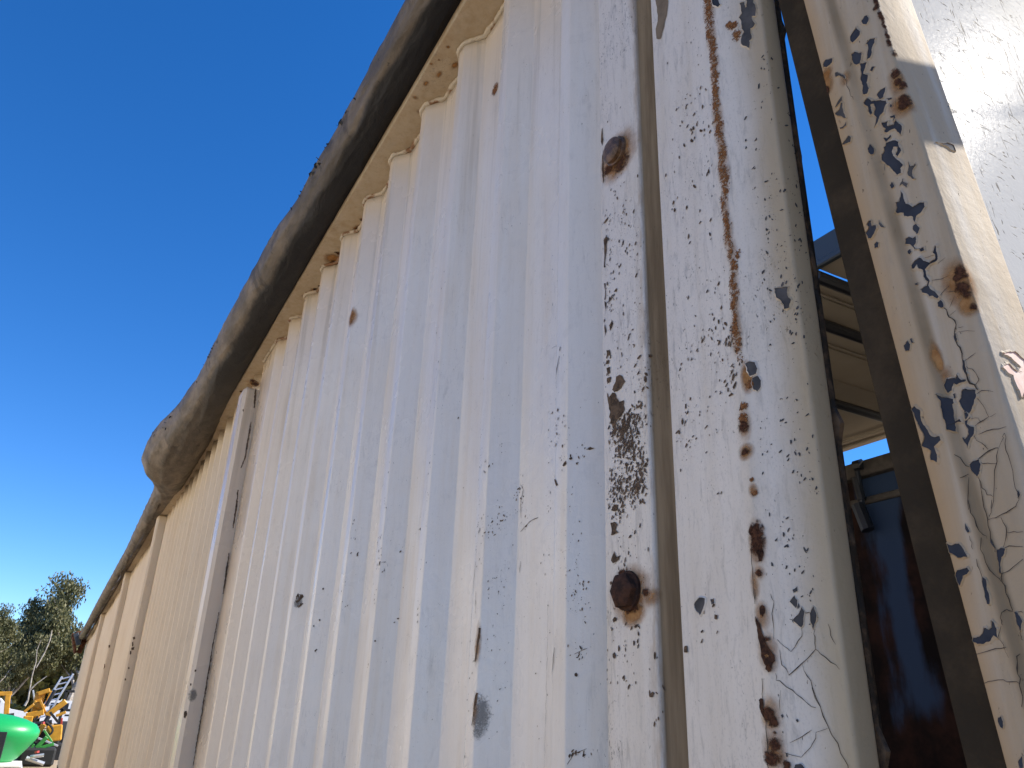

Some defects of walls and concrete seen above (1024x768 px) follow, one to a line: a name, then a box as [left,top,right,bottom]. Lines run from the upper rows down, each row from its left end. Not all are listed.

spalling [725,0,758,50]
rust [873,0,914,114]
rust [601,131,630,182]
rust [703,0,743,360]
spalling [823,15,945,309]
rust [946,265,977,313]
spalling [911,373,982,478]
crack [925,255,1023,707]
peeling [1000,349,1024,400]
spalling [946,523,1007,606]
rust [748,521,791,768]
crack [771,596,848,768]